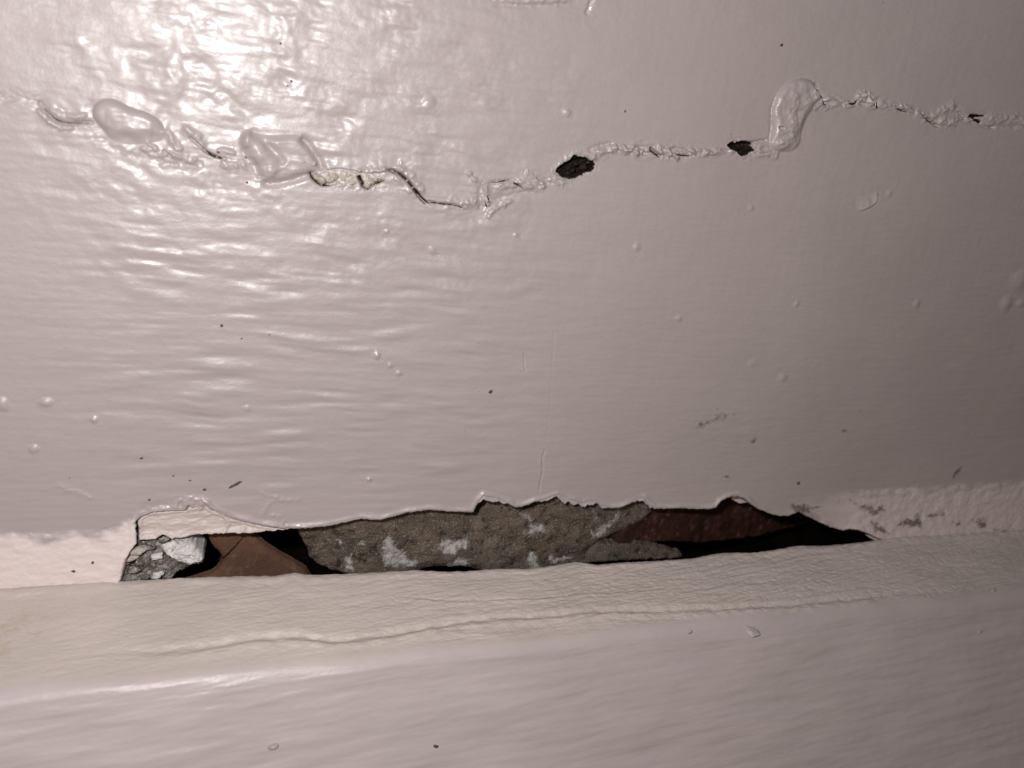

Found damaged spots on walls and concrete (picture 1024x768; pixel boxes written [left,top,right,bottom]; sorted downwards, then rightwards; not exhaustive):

crack [813,83,1024,140]
crack [0,77,253,183]
hole [727,141,755,156]
crack [281,130,786,227]
hole [556,155,595,179]
peeling [478,496,509,504]
peeling [540,495,608,509]